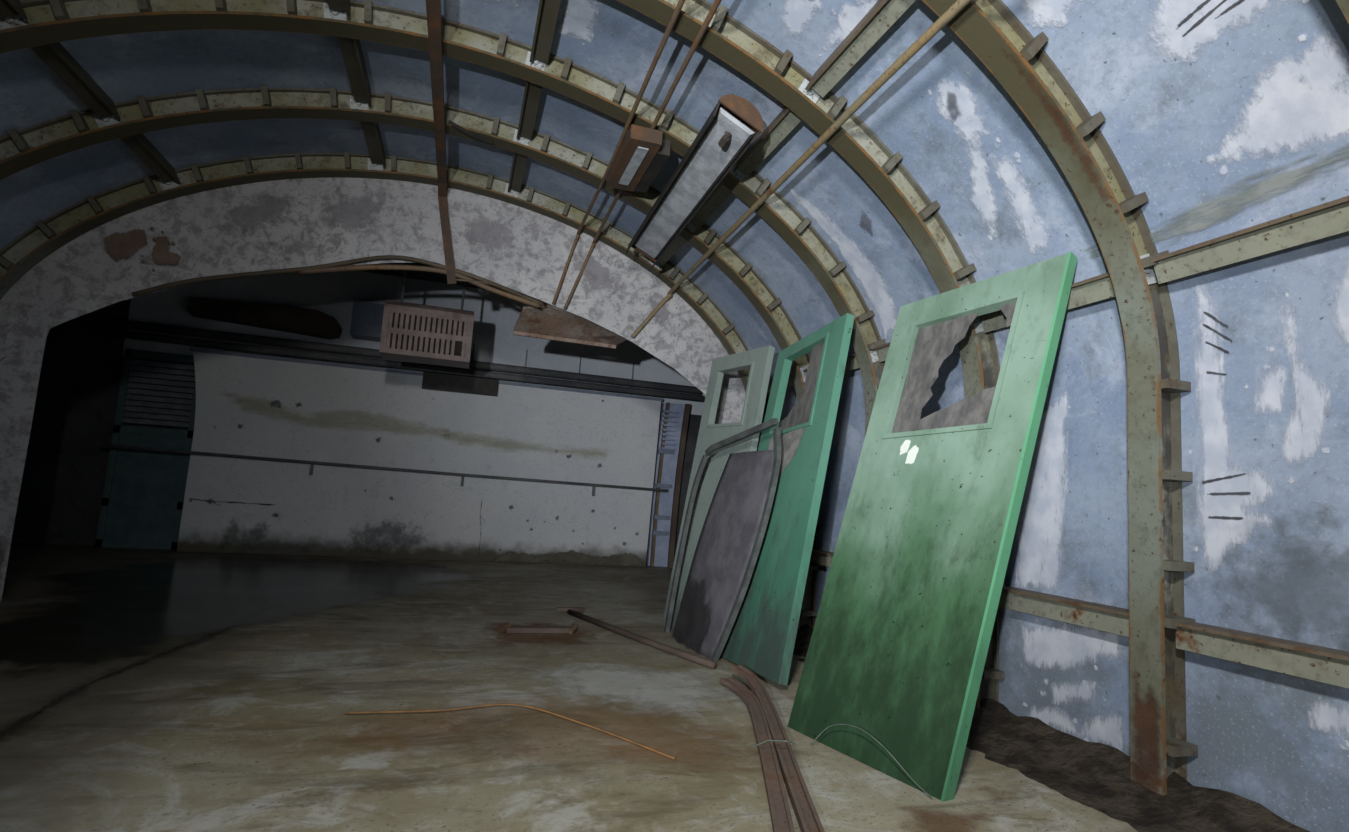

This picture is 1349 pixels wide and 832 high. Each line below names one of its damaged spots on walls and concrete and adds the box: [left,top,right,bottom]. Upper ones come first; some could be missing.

peeling [1207,31,1349,175]
peeling [1334,267,1349,343]
corrosion [1132,674,1160,794]
peeling [1308,702,1349,749]